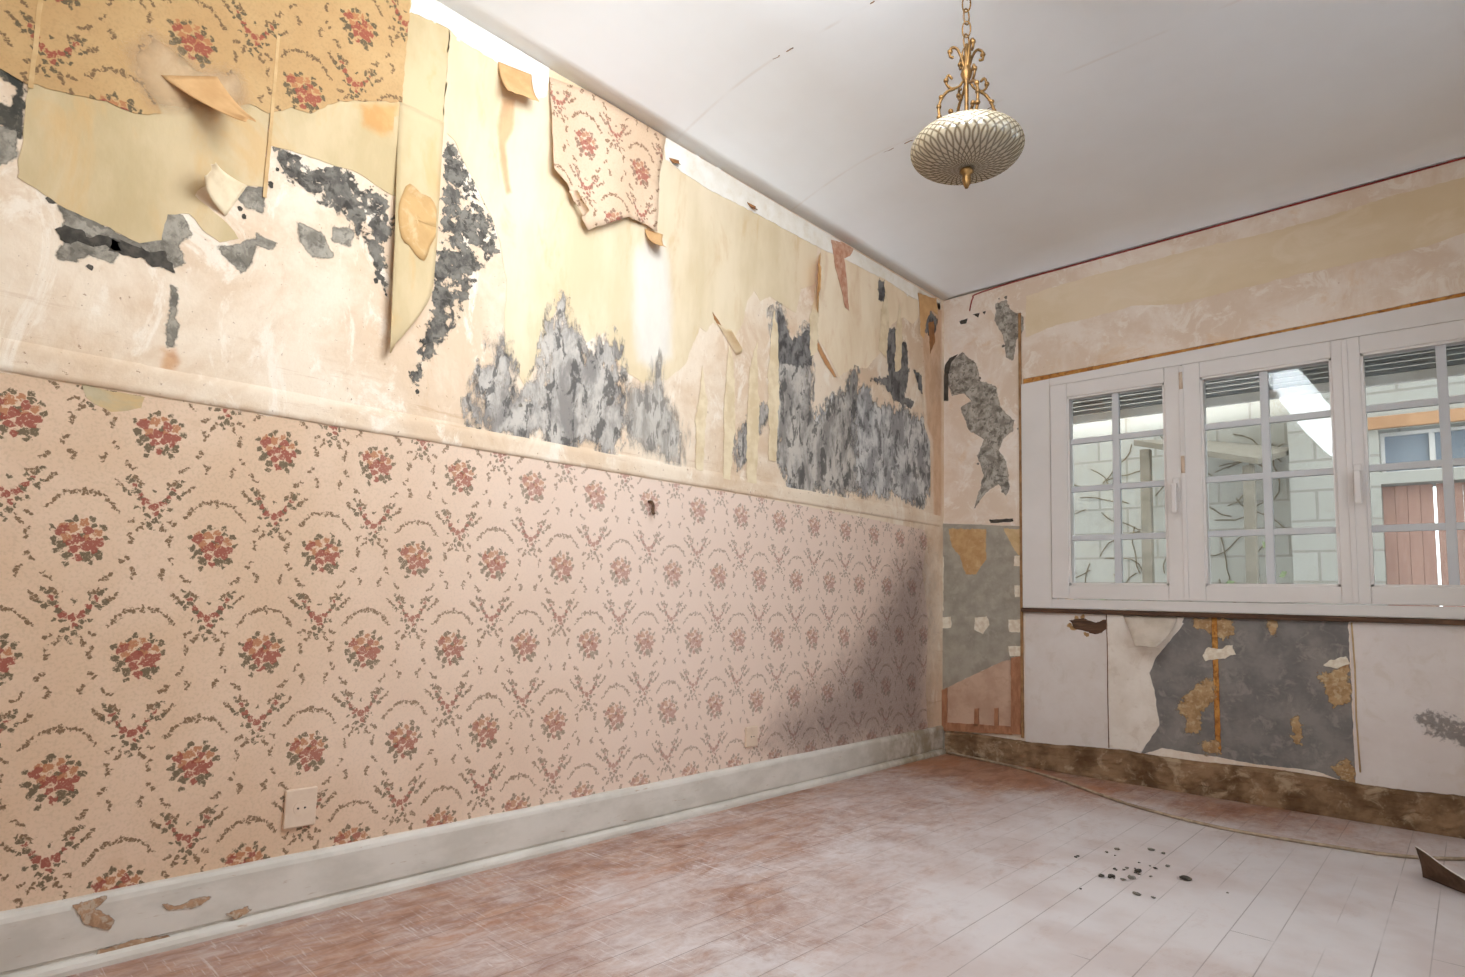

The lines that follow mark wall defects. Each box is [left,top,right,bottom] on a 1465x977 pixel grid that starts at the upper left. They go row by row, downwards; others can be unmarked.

peeling [0,69,28,166]
peeling [45,197,192,348]
peeling [219,233,276,273]
peeling [237,146,395,296]
peeling [408,142,500,394]
peeling [460,138,940,510]
peeling [959,296,1023,360]
peeling [948,352,1018,508]
peeling [949,518,1020,575]
flaking render [1025,612,1465,796]
peeling [72,896,170,954]
peeling [162,896,211,911]